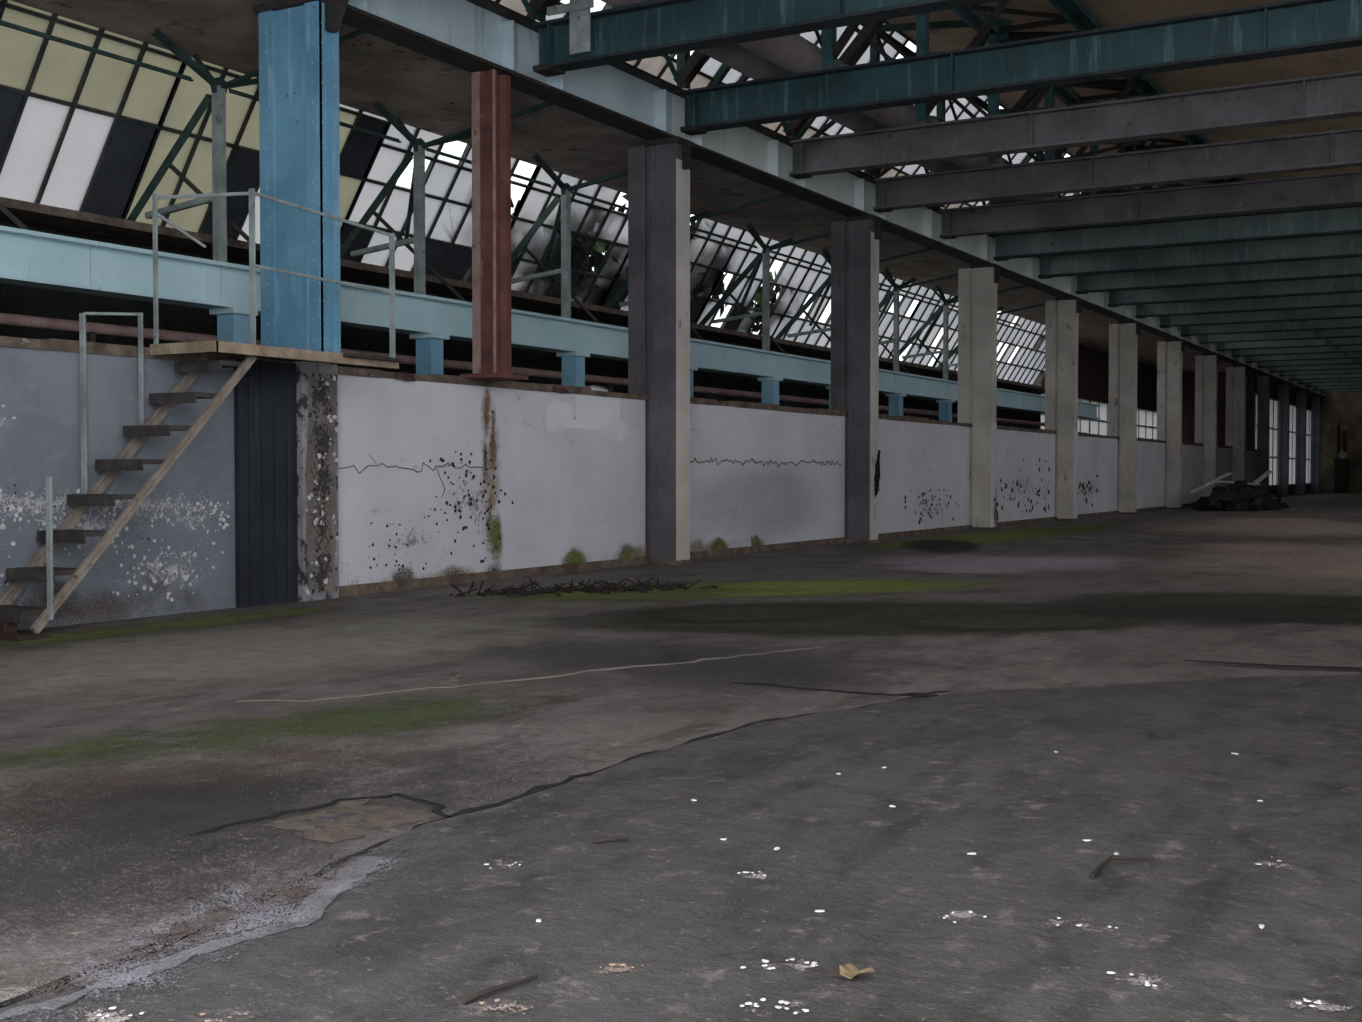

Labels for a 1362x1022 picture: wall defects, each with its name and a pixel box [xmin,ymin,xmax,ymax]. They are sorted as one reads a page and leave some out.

peeling [306,367,340,595]
damp [15,562,236,630]
crack [0,647,948,1008]